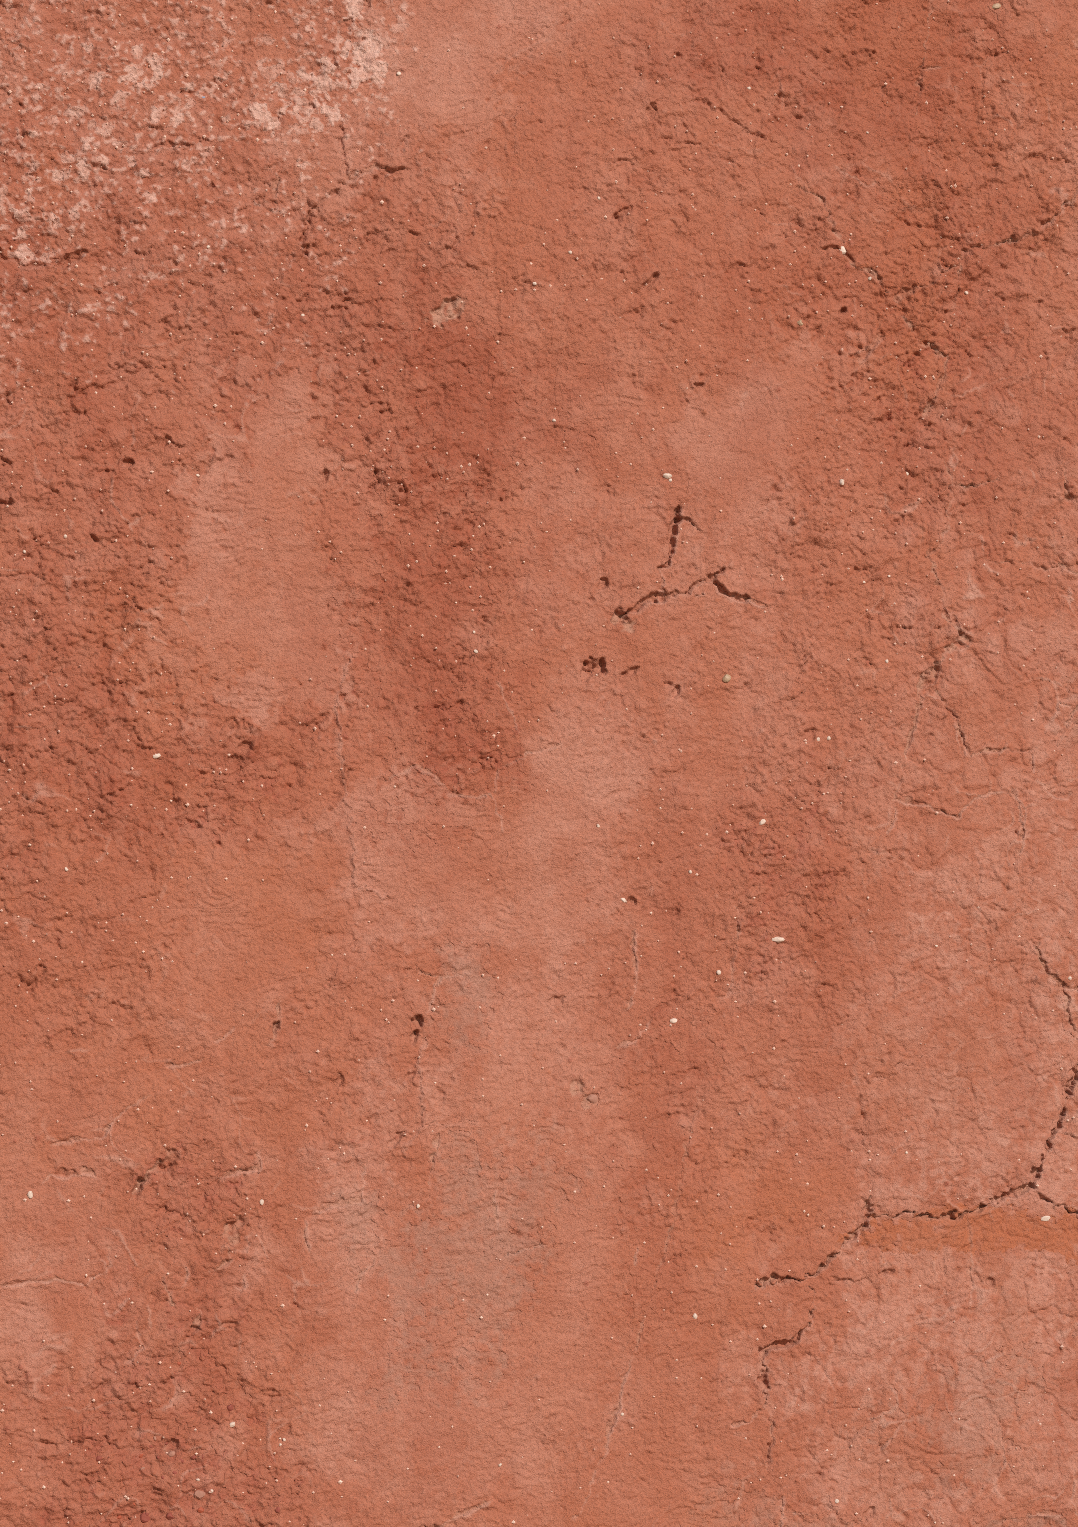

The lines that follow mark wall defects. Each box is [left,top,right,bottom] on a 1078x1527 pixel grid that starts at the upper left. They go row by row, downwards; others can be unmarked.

crack [625,506,768,614]
crack [936,942,1078,1220]
crack [730,1200,873,1452]